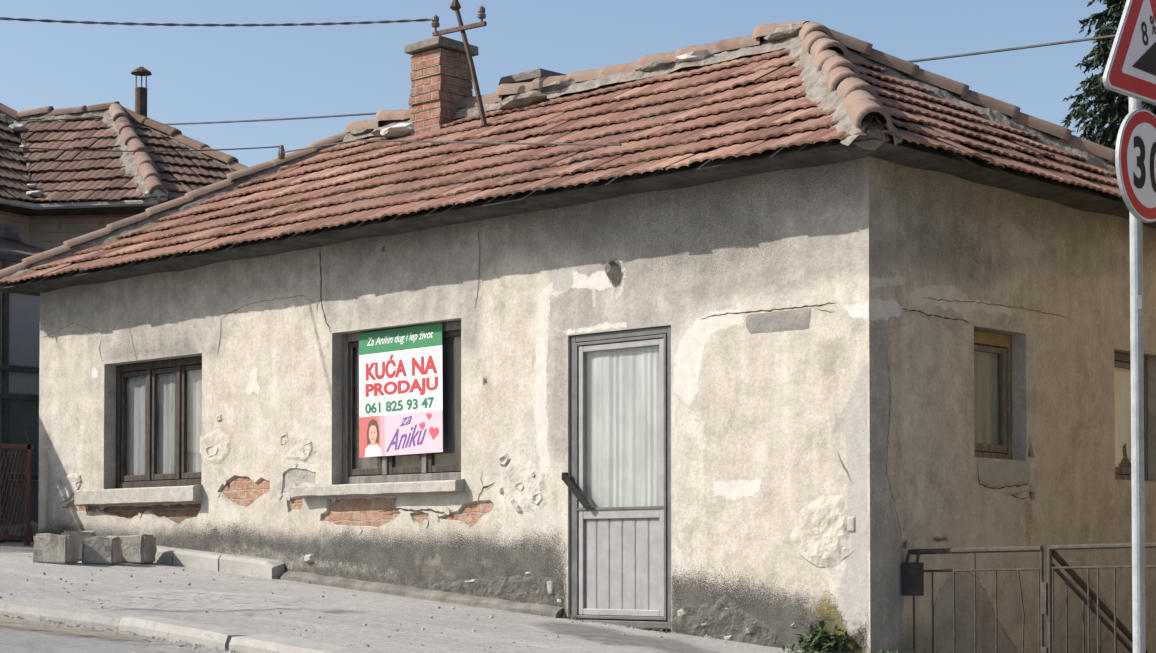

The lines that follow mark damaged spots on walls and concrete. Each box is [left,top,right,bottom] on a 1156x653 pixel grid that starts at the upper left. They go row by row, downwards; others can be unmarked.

spalling [604,259,622,288]
crack [217,254,330,355]
crack [703,302,833,319]
crack [900,297,1068,328]
flaking render [52,473,201,525]
flaking render [217,463,316,512]
flaking render [320,495,494,534]
damp [38,510,843,653]
damp [846,621,870,653]